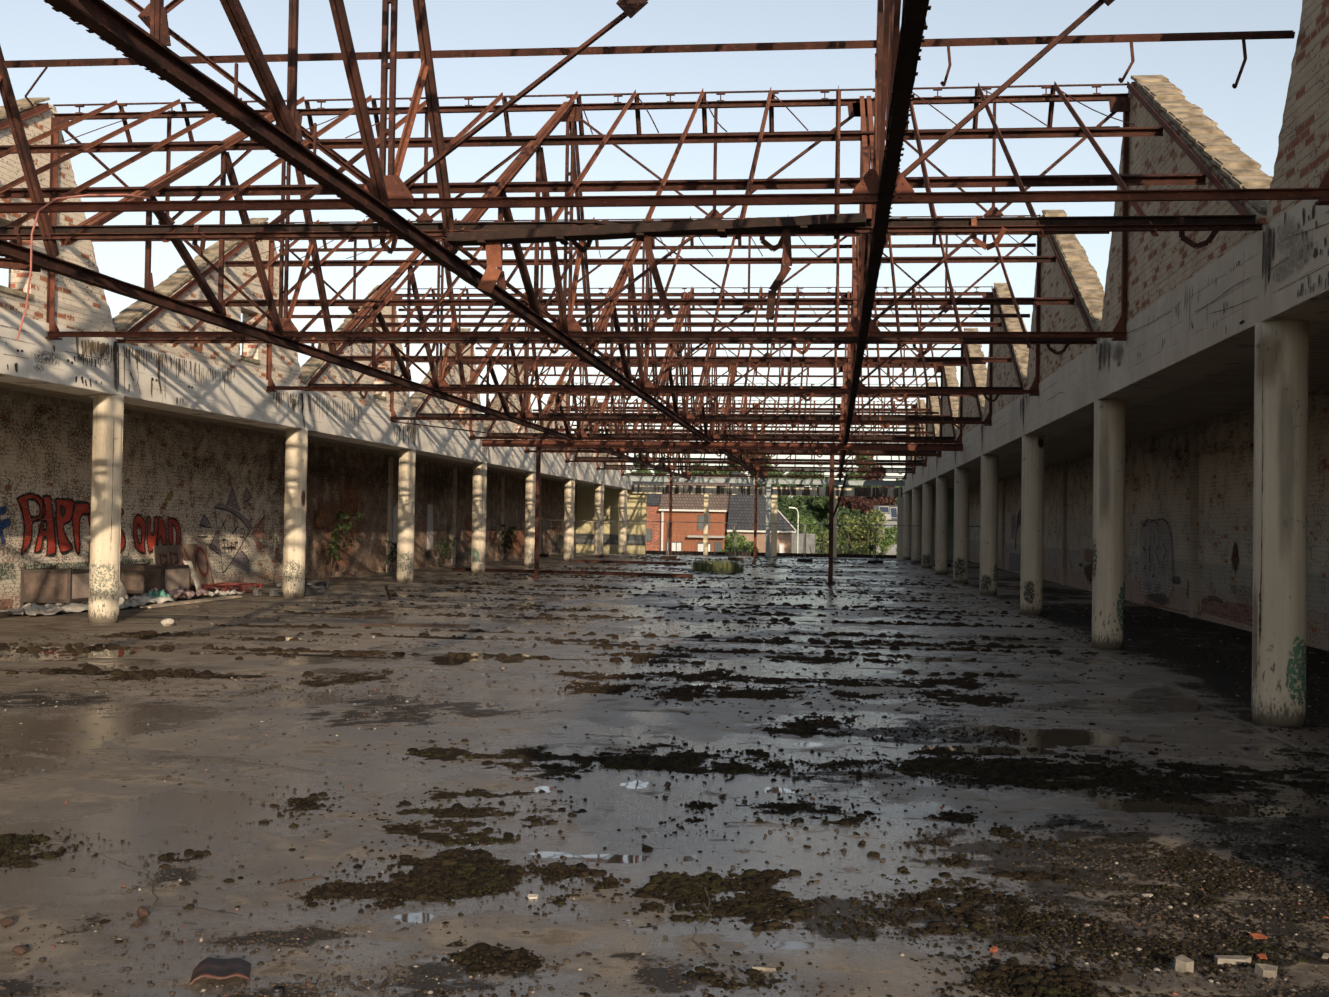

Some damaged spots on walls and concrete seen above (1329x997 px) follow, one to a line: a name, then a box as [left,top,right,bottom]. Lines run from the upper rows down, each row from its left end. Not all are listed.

leakage [1262,205,1329,298]
leakage [74,337,235,396]
leakage [273,391,362,428]